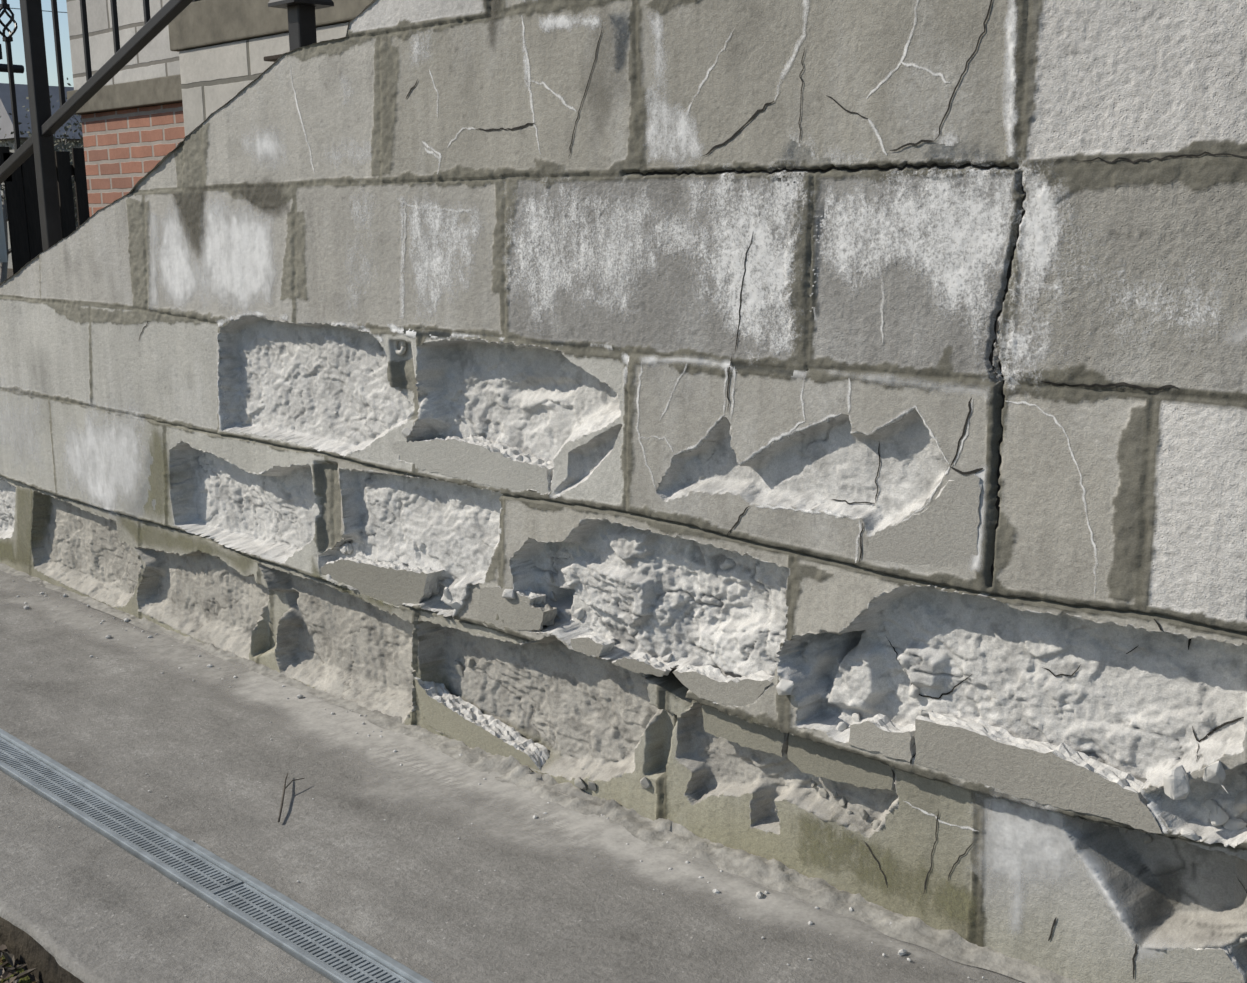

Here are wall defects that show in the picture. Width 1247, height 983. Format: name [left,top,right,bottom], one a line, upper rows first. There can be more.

leakage [539,15,599,32]
leakage [646,13,701,162]
leakage [1003,0,1017,157]
crack [1072,151,1247,163]
leakage [150,181,284,430]
leakage [507,170,807,359]
leakage [605,346,733,383]
crack [626,0,1178,592]
leakage [810,162,1073,387]
spalling [0,477,16,539]
leakage [971,468,985,568]
spalling [31,315,1247,983]